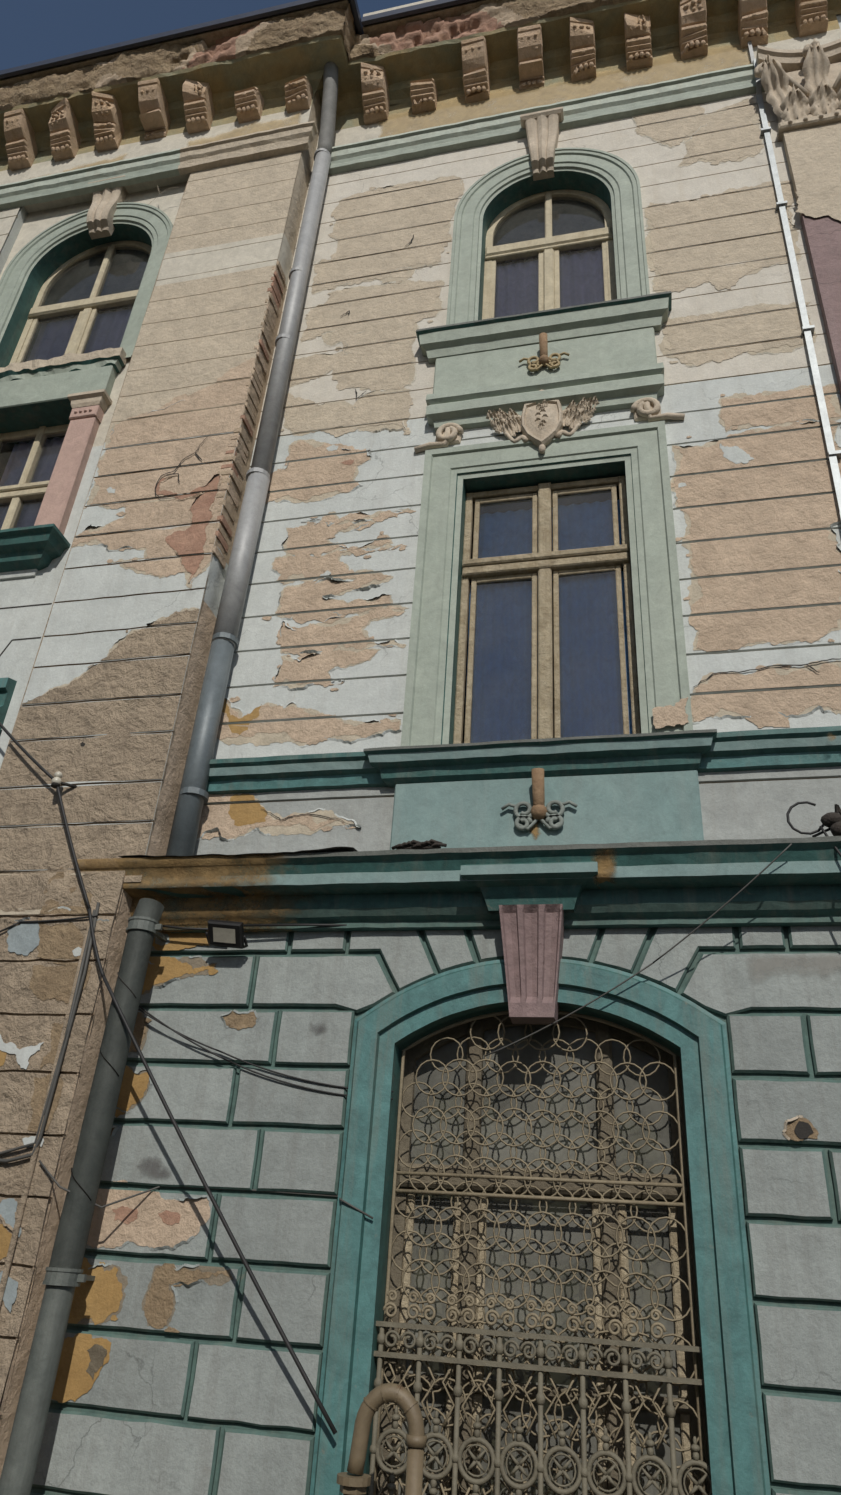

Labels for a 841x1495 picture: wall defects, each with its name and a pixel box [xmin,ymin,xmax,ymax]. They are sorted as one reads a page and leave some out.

peeling [72,261,286,588]
peeling [217,175,465,748]
peeling [670,383,841,652]
peeling [652,660,841,729]
peeling [0,607,200,1007]
corrosion [74,854,281,933]
corrosion [595,848,614,884]
peeling [0,1022,69,1147]
peeling [115,933,218,1118]
peeling [221,1009,259,1030]
peeling [0,1198,21,1312]
flaking render [51,1180,234,1403]